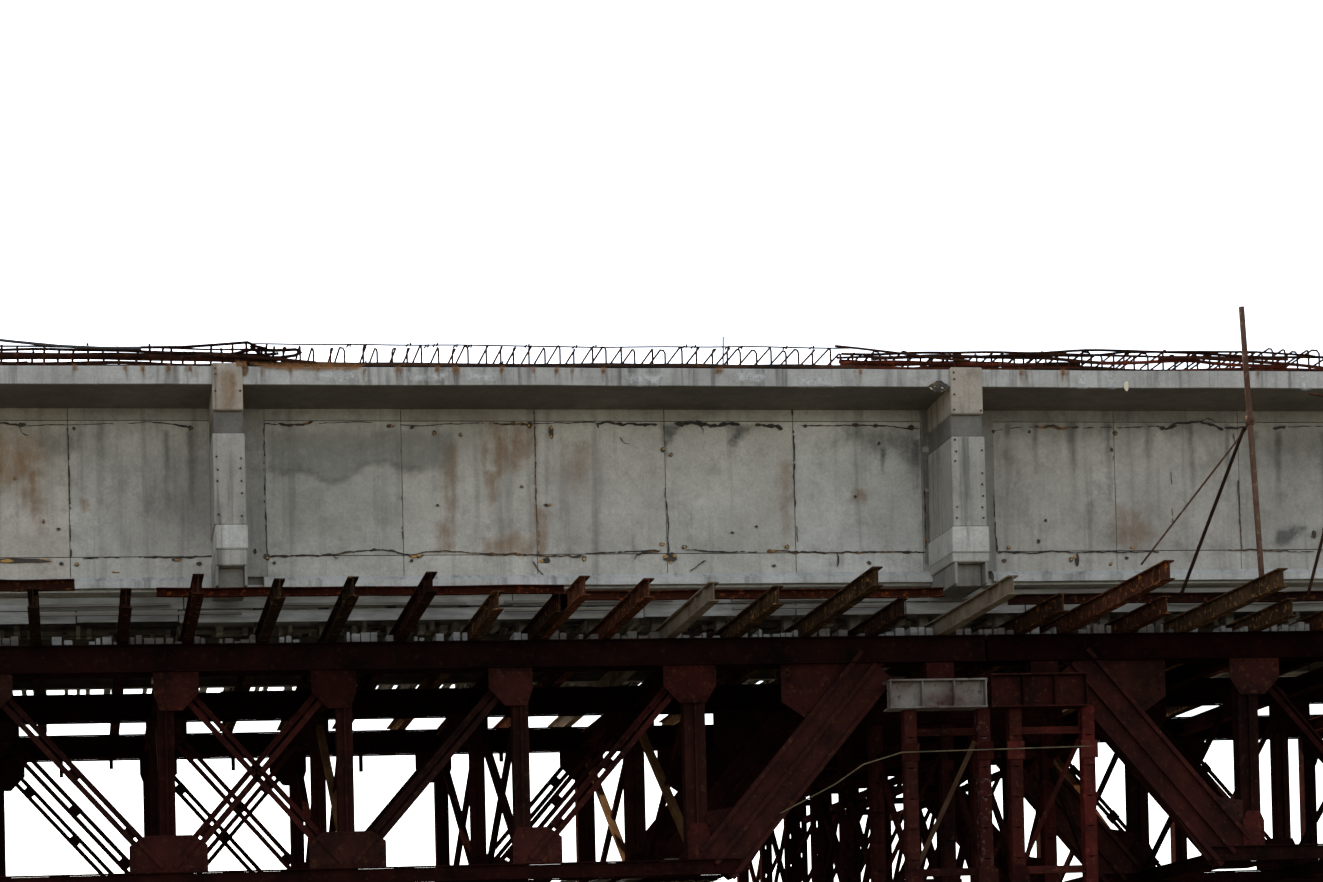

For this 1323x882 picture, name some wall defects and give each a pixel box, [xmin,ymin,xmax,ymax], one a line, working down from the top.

crack [263,409,927,575]